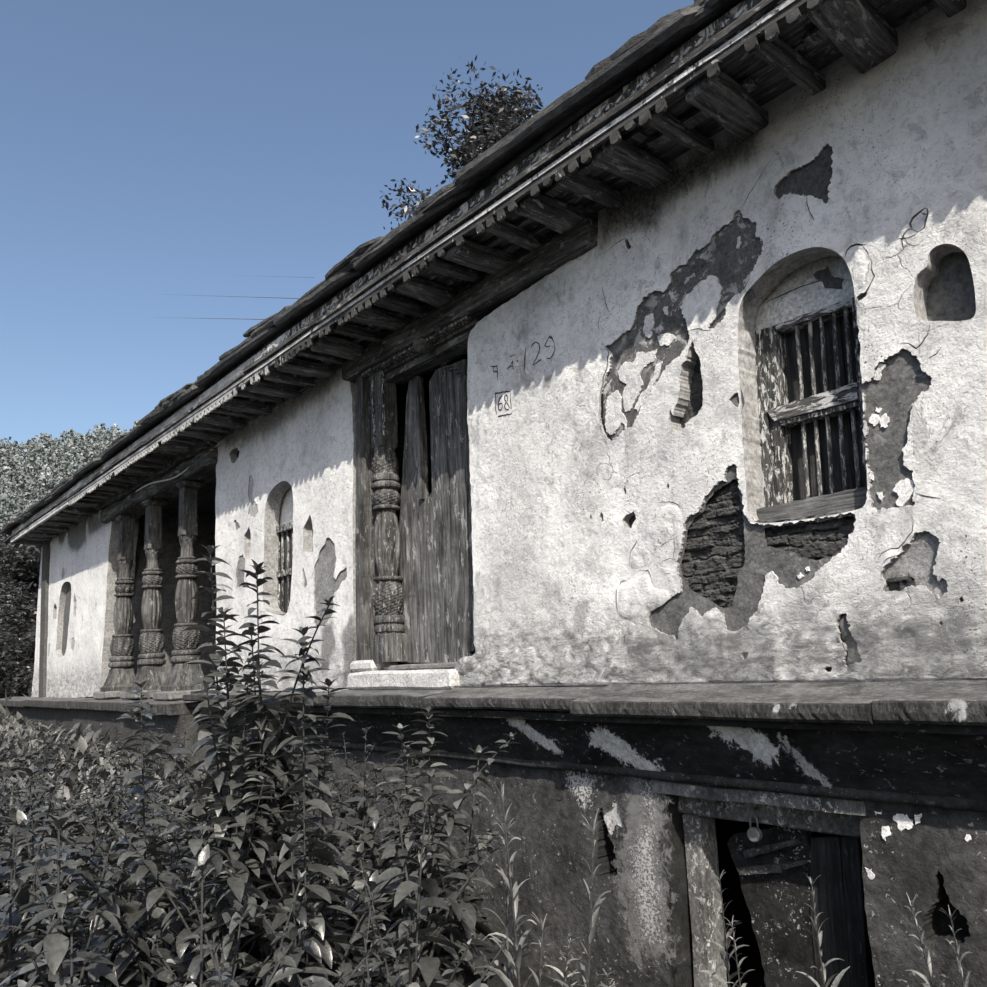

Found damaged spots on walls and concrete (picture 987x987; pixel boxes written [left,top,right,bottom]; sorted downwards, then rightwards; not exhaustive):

flaking render [776,146,833,203]
flaking render [601,211,763,440]
flaking render [859,349,932,510]
flaking render [303,538,347,626]
flaking render [649,465,856,639]
flaking render [838,614,862,666]
flaking render [883,531,948,598]
damp [585,724,685,970]